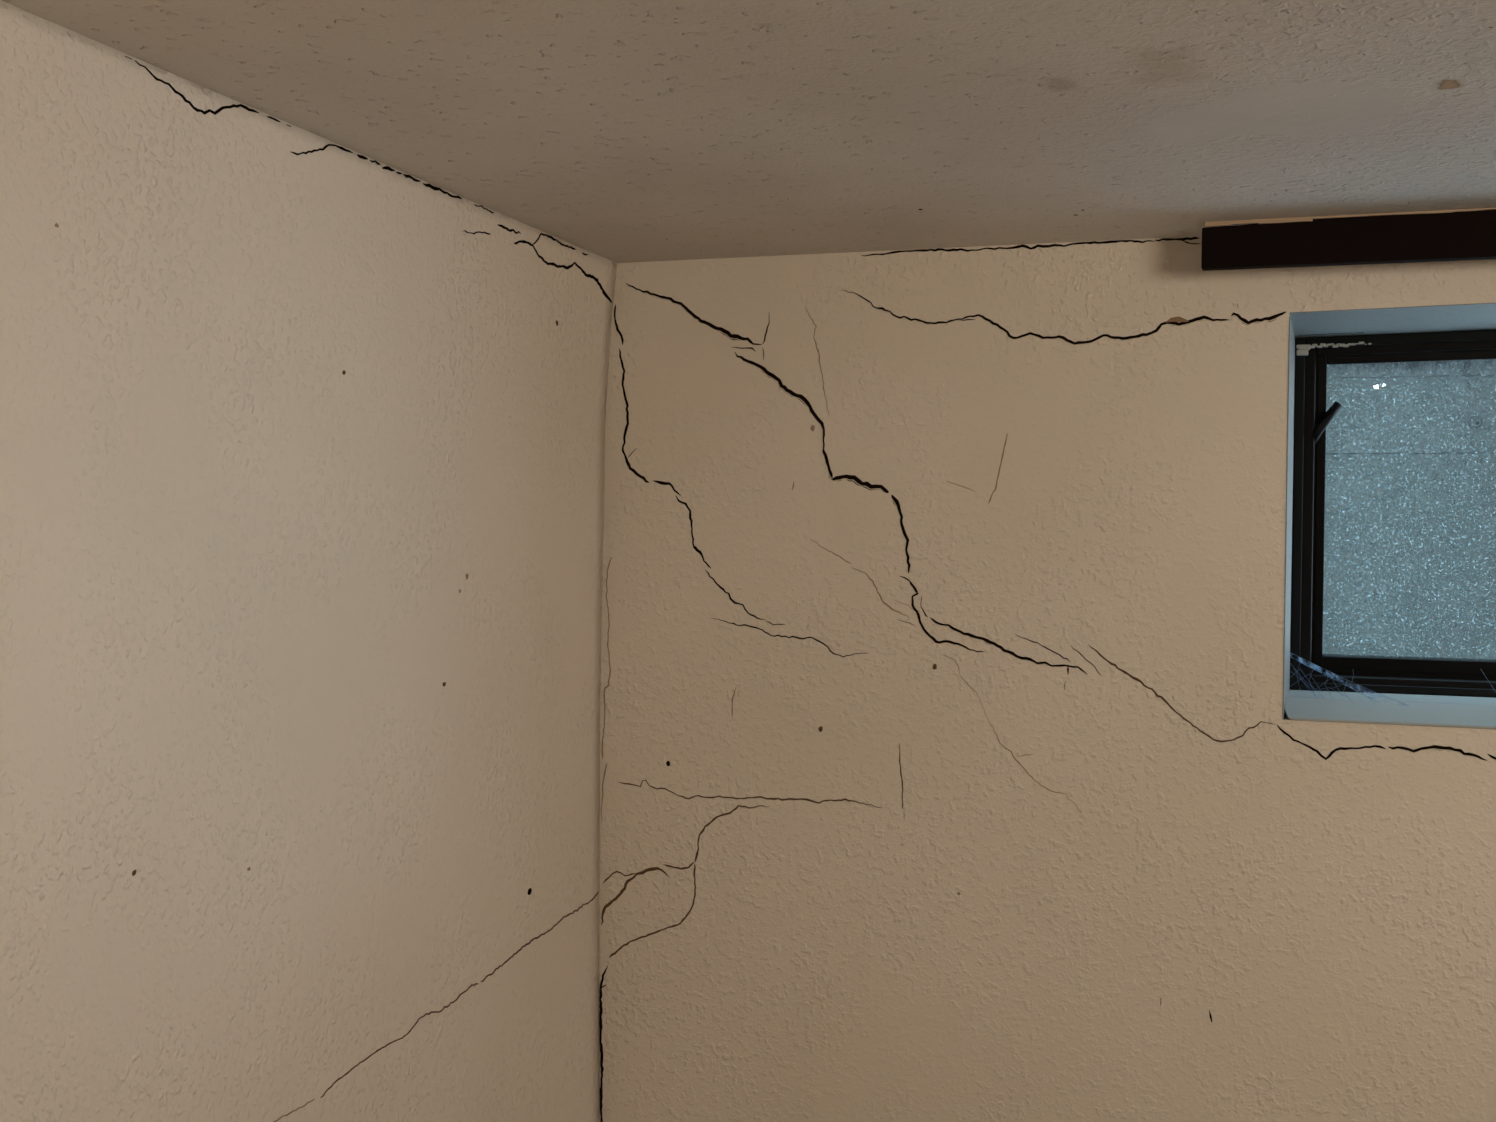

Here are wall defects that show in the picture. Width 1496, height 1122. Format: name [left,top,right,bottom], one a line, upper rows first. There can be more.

crack [125,56,1496,811]
crack [273,557,903,1122]